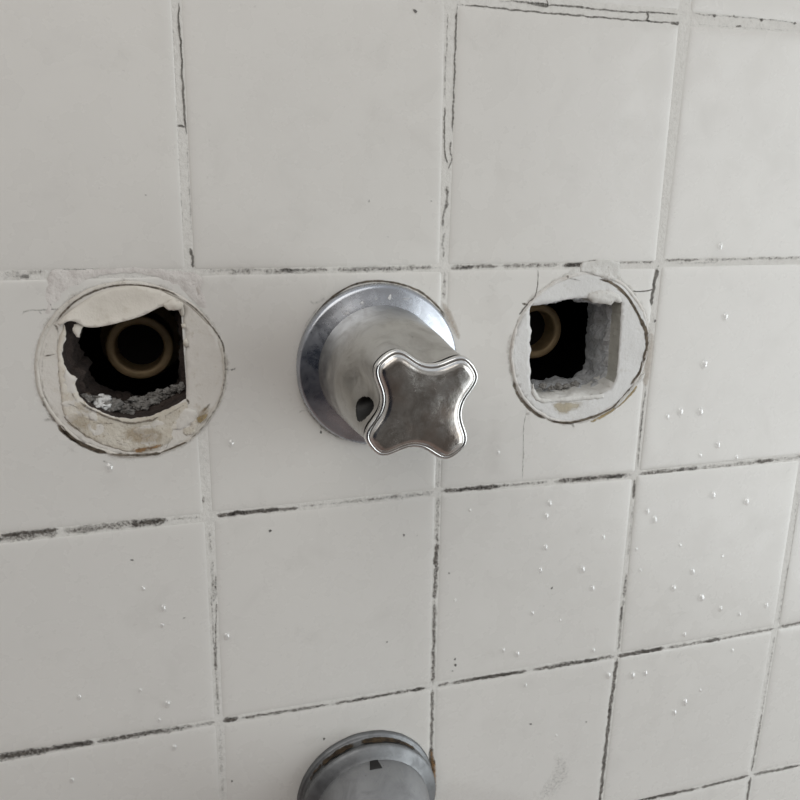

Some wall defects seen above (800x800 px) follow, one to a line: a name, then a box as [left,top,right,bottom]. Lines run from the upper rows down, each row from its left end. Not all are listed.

flaking render [38,285,223,455]
flaking render [513,259,656,421]
water stain [0,528,56,541]
water stain [74,518,165,533]